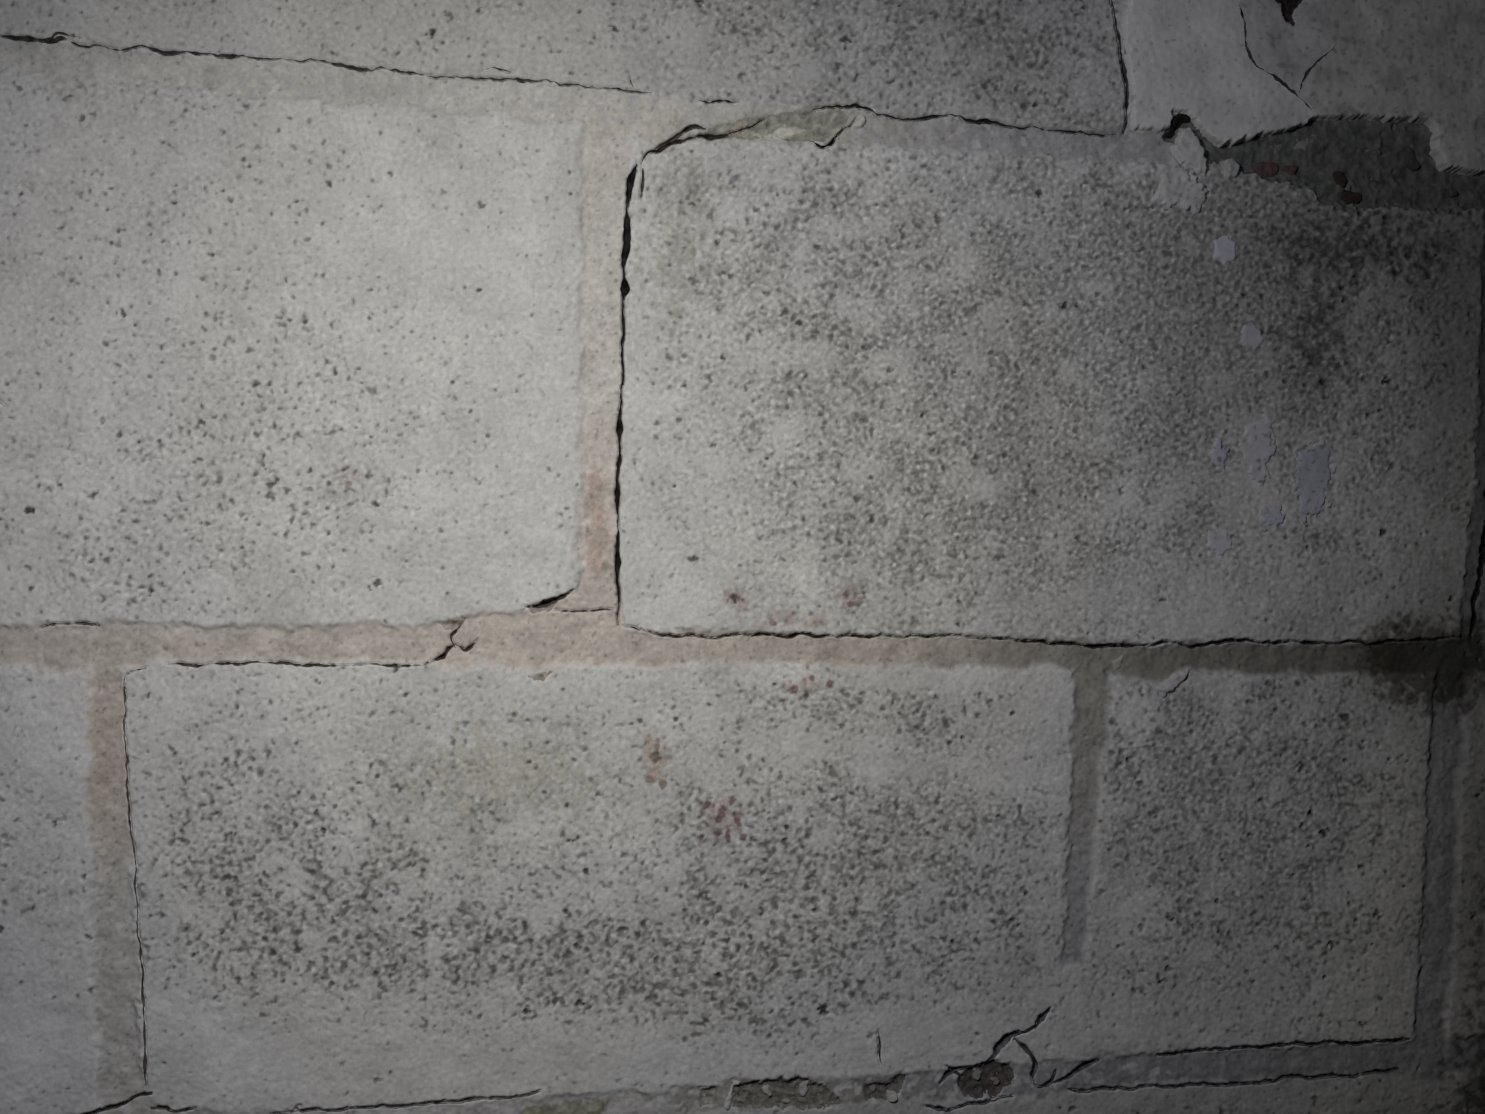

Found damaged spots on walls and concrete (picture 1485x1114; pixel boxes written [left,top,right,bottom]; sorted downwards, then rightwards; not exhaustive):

crack [0,32,651,93]
crack [812,0,1129,149]
crack [1239,5,1336,110]
flaking render [1120,0,1485,215]
crack [524,99,1485,648]
crack [42,620,100,628]
crack [87,622,475,1114]
crack [276,1091,540,1114]
spalling [957,1059,1014,1099]
crack [927,1008,1408,1112]